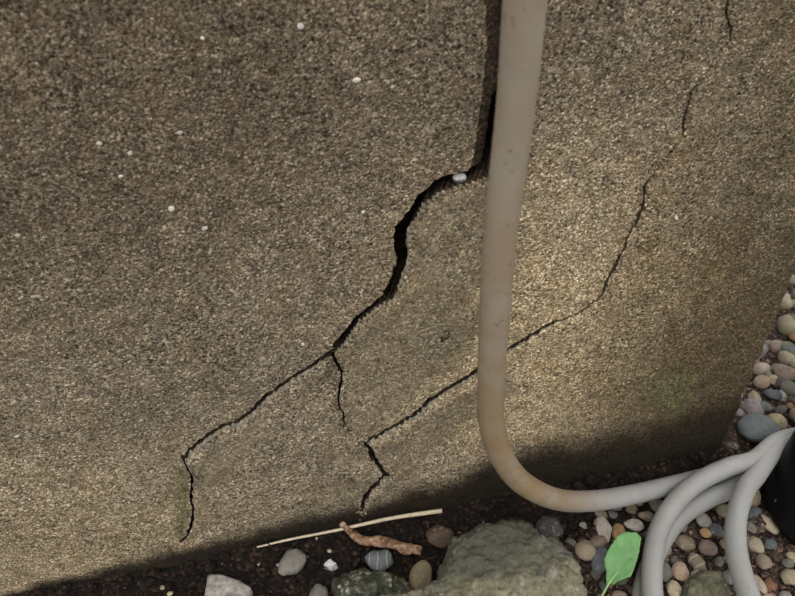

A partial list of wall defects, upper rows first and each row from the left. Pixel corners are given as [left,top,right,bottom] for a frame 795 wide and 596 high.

crack [179,0,502,543]
crack [507,0,733,354]